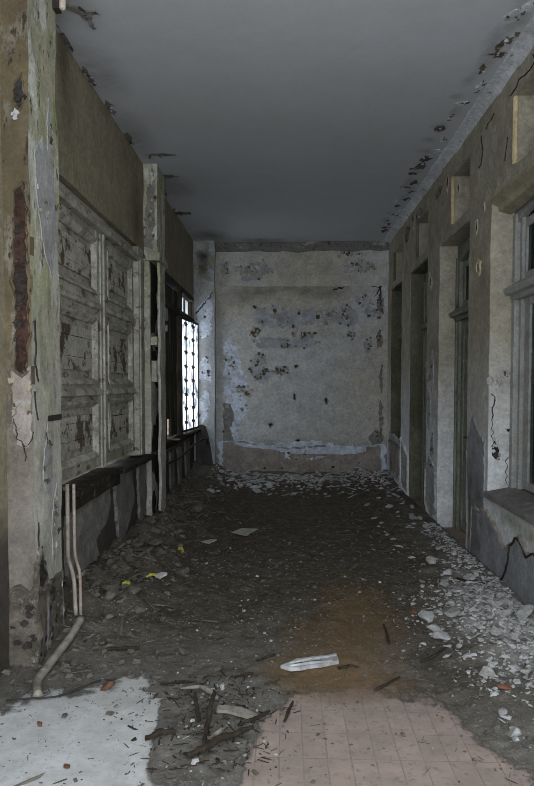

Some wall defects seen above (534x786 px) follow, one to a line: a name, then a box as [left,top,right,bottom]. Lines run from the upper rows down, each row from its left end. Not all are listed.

flaking render [487,32,521,58]
crack [510,54,534,96]
flaking render [381,114,454,233]
flaking render [7,98,57,449]
peeling [219,258,275,282]
peeling [197,299,213,340]
peeling [199,356,212,425]
peeling [218,294,409,495]
crack [500,537,534,580]